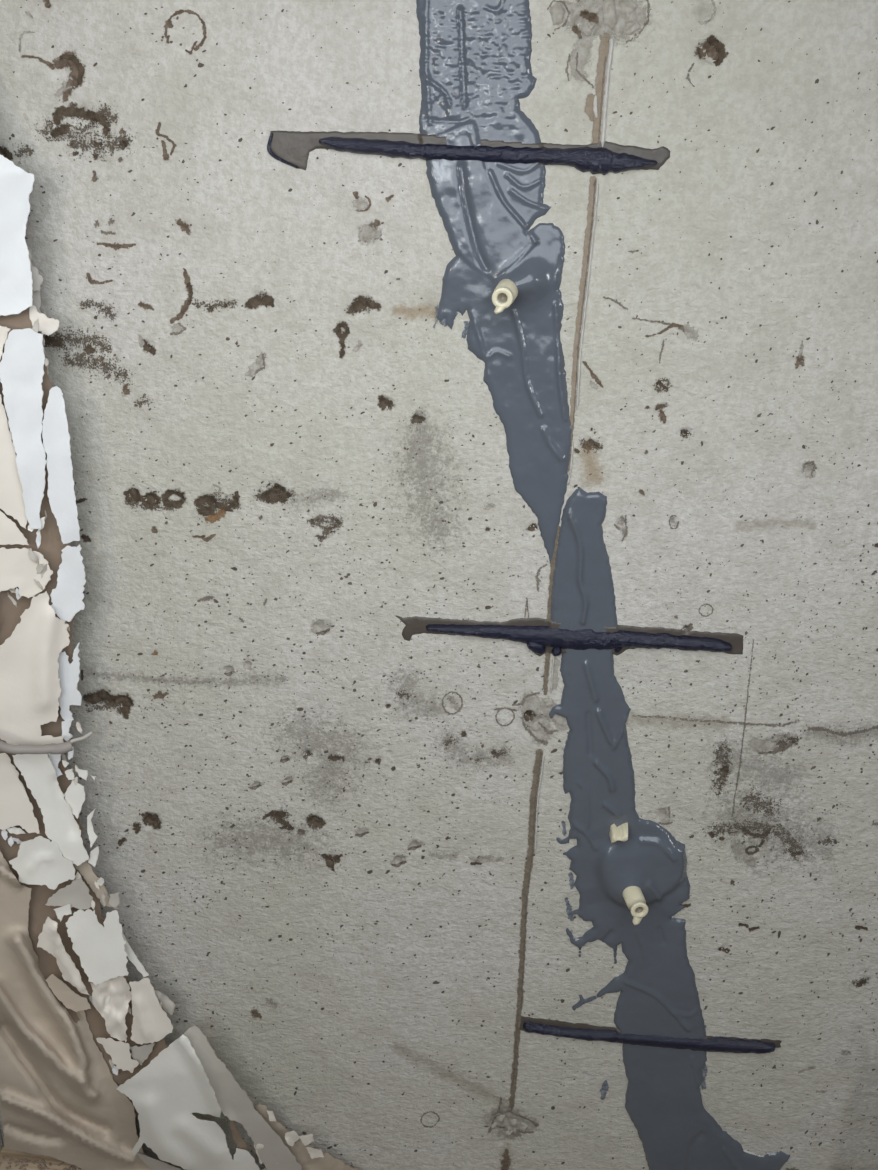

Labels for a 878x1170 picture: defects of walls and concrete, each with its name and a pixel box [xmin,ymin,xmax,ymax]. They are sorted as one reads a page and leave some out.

peeling [170,323,186,335]
crack [603,296,699,363]
spalling [139,335,156,356]
peeling [245,353,266,377]
crack [633,639,878,817]